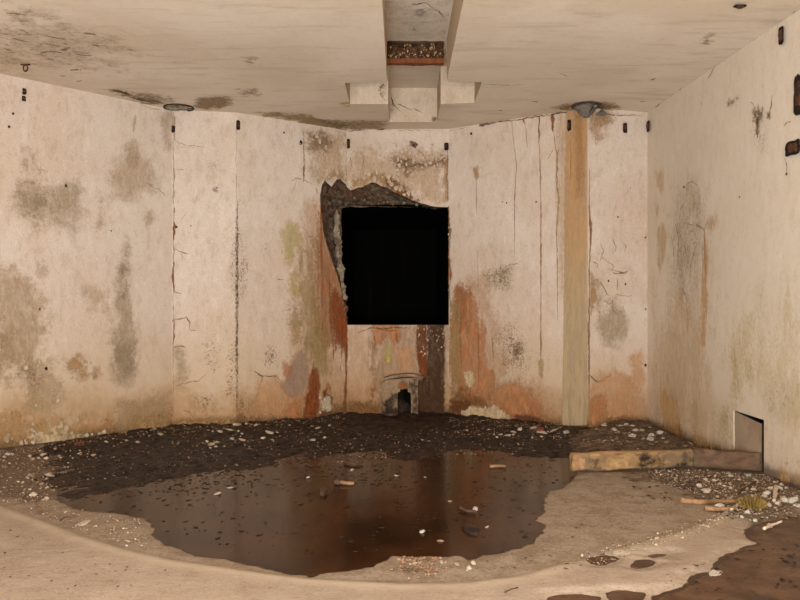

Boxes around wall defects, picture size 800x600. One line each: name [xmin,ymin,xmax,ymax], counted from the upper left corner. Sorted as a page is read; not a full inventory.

damp [113,90,170,110]
damp [194,97,231,110]
damp [15,181,79,224]
damp [112,268,136,382]
crack [151,139,200,424]
damp [178,204,248,425]
rust [300,205,378,418]
spalling [320,168,452,324]
rust [449,284,545,421]
damp [539,104,643,427]